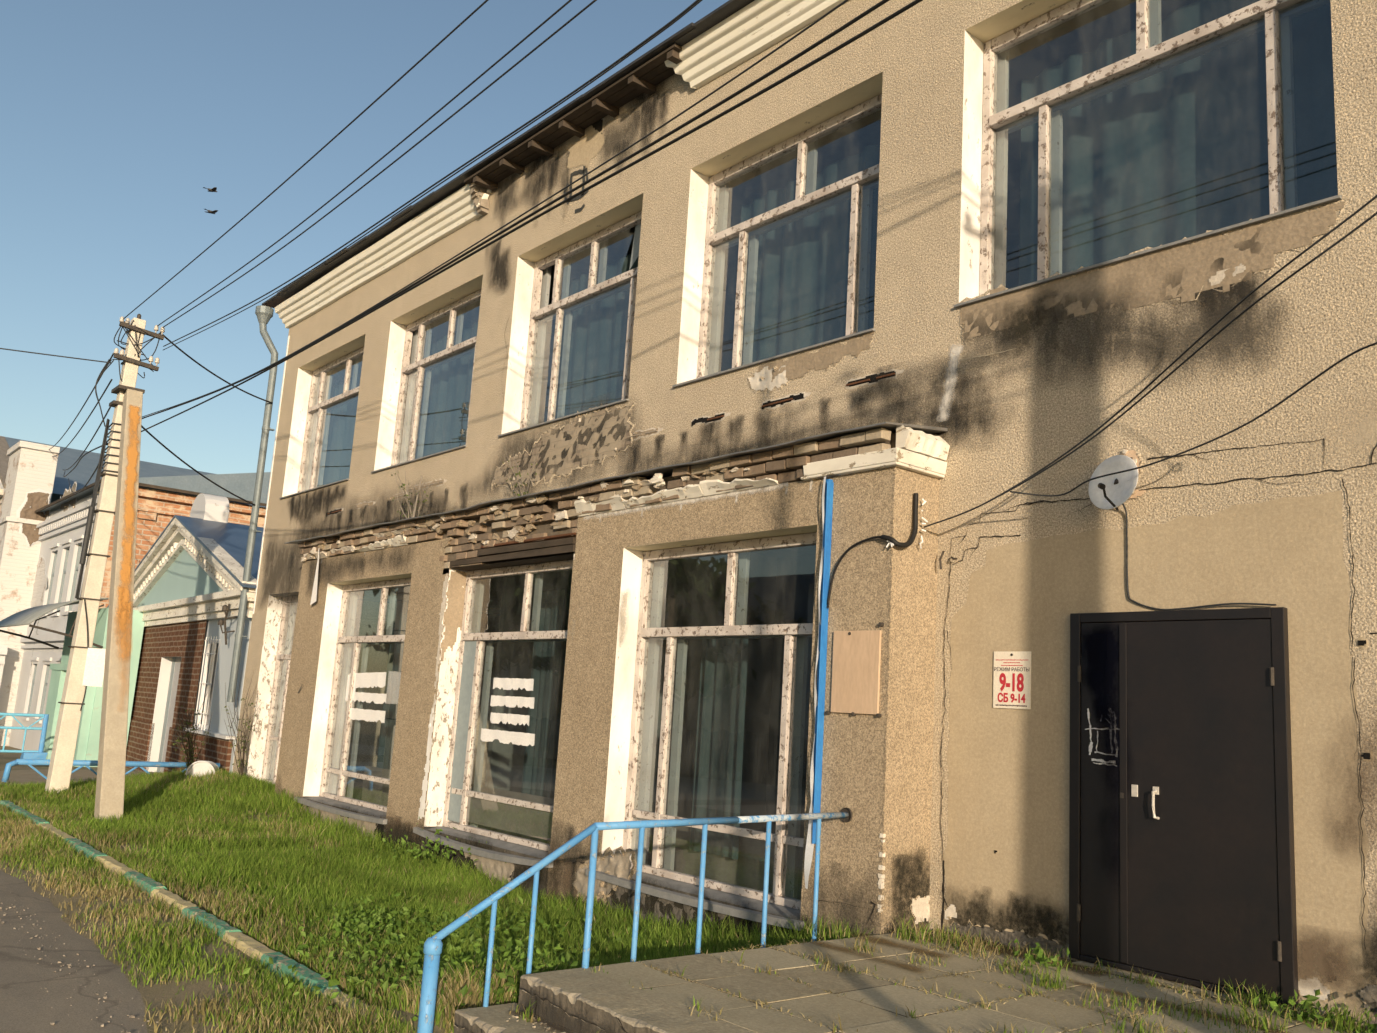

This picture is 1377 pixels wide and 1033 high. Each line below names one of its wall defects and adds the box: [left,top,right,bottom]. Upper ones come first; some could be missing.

damp [604,83,668,161]
damp [496,150,570,210]
damp [493,242,508,289]
spalling [959,200,1347,343]
damp [970,280,1275,366]
spalling [747,331,876,411]
spalling [845,369,905,389]
damp [855,346,991,436]
damp [675,418,804,463]
flaking render [298,401,891,889]
spalling [877,468,896,923]
crack [1141,438,1377,950]